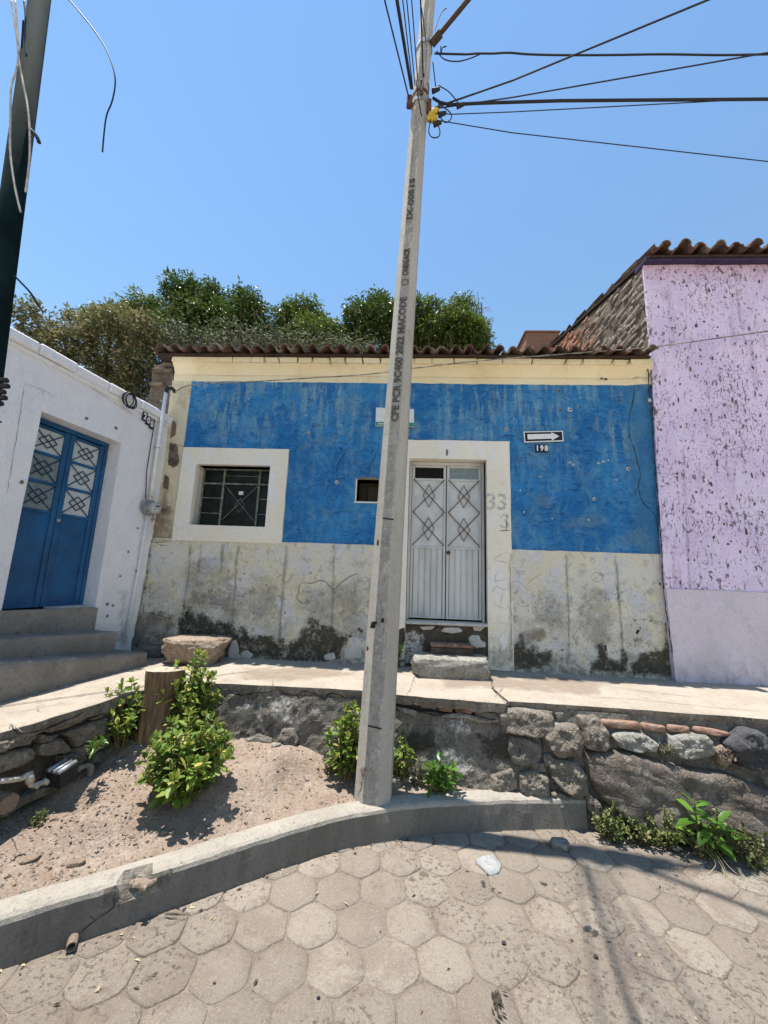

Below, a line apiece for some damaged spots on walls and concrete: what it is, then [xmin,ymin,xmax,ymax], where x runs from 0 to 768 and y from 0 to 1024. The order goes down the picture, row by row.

crack [592,369,673,658]
leakage [178,606,349,662]
leakage [512,634,552,669]
leakage [590,623,672,677]
crack [400,674,466,716]